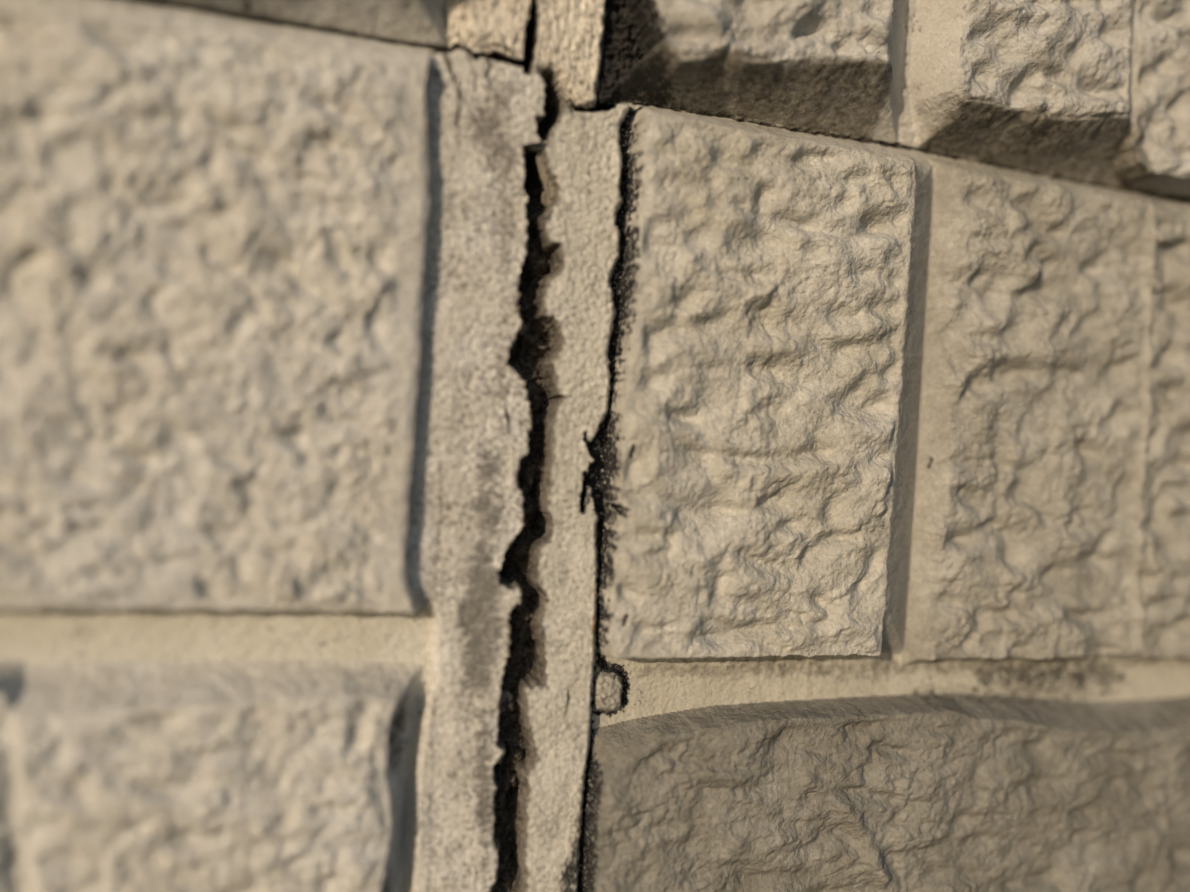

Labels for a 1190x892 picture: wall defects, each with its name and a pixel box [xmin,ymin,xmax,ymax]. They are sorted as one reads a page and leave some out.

crack [426,0,617,892]